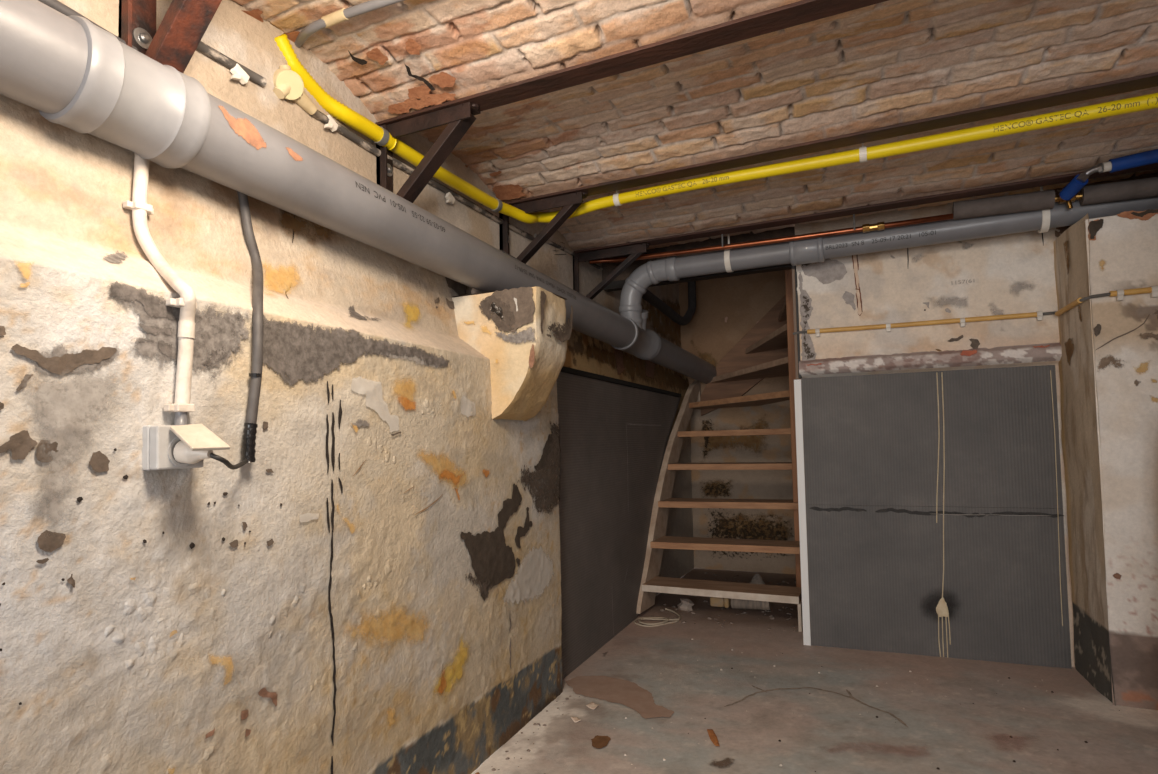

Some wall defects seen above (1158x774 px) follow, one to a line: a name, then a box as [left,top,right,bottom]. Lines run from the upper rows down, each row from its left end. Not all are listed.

peeling [0,326,119,391]
peeling [0,430,58,463]
damp [702,419,768,457]
peeling [460,419,561,606]
damp [702,481,793,559]
crack [810,507,1064,518]
crack [326,381,366,774]